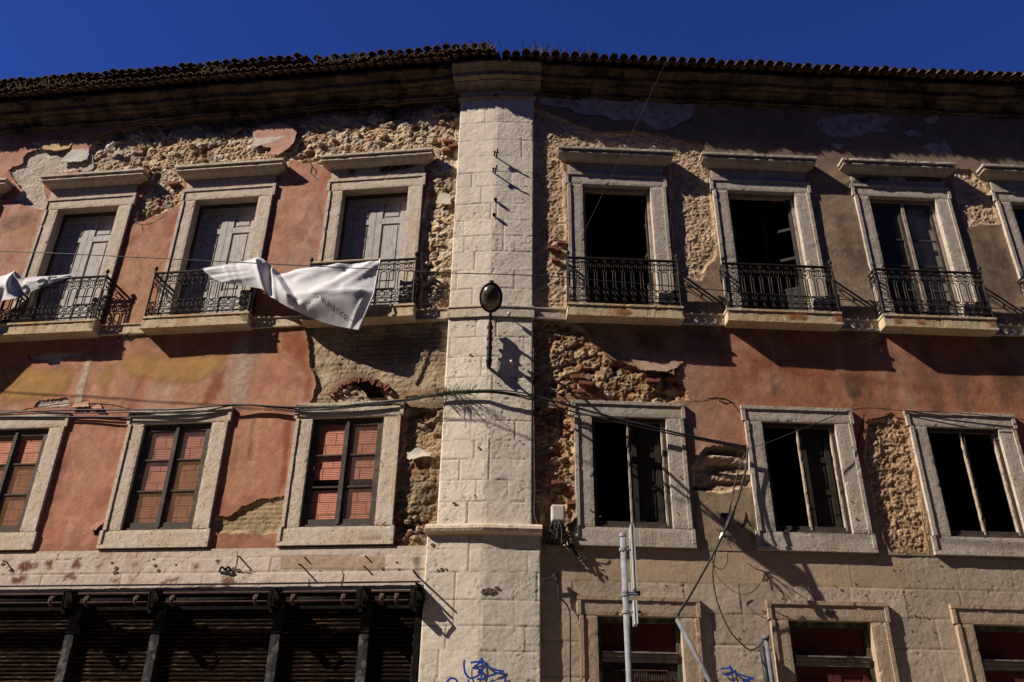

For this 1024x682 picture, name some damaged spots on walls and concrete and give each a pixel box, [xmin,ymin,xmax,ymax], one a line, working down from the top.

peeling [252,128,284,148]
flaking render [10,140,94,210]
peeling [436,192,451,205]
flaking render [533,95,718,308]
flaking render [949,169,1000,229]
peeling [407,448,432,460]
flaking render [679,446,751,494]
flaking render [851,413,928,555]
flaking render [213,496,285,535]